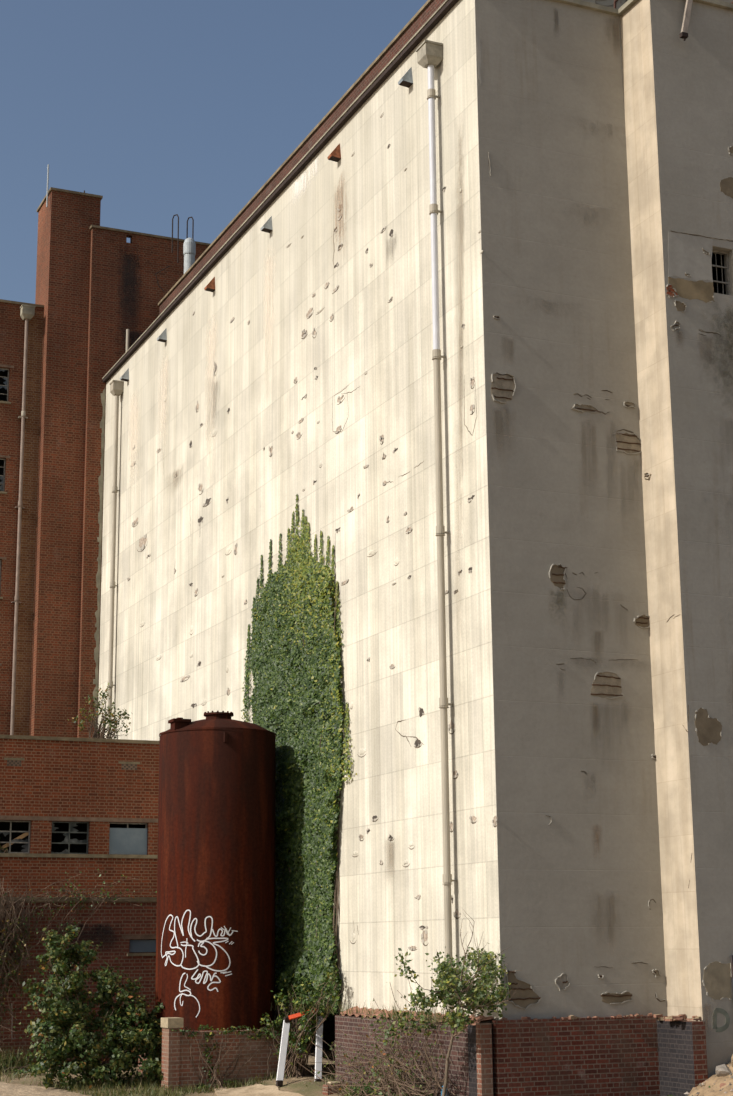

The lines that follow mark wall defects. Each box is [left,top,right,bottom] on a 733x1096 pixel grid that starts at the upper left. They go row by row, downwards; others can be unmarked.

peeling [720,177,733,199]
peeling [666,273,715,331]
spalling [491,373,517,403]
spalling [571,403,601,413]
spalling [615,432,642,455]
spalling [549,563,567,591]
spalling [633,615,650,629]
spalling [591,671,624,699]
peeling [695,708,722,746]
spalling [506,969,542,1021]
spalling [552,991,702,1021]
peeling [702,961,733,1001]